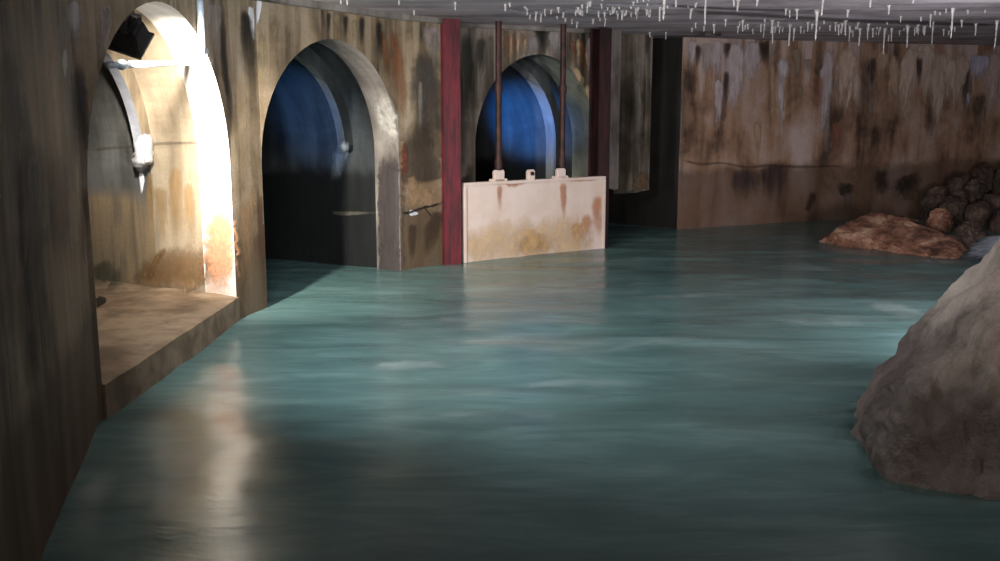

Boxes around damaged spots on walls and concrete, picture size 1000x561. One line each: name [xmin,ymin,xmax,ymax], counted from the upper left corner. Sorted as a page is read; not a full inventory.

damp [682,34,768,121]
damp [779,45,1000,129]
rust [573,200,600,236]
damp [141,250,208,289]